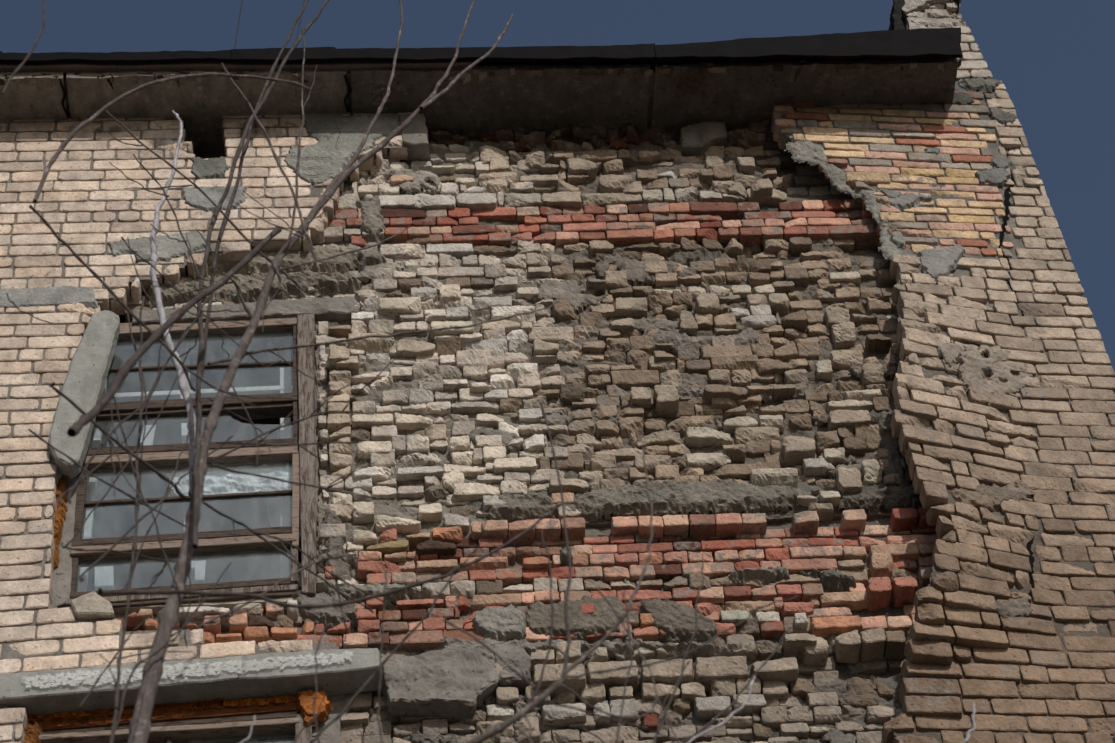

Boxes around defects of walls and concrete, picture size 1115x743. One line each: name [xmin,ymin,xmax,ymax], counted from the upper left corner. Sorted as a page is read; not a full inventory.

crack [998,148,1024,316]
spalling [125,112,938,743]
crack [1027,538,1035,598]
spalling [114,608,164,631]
peeling [21,667,143,688]